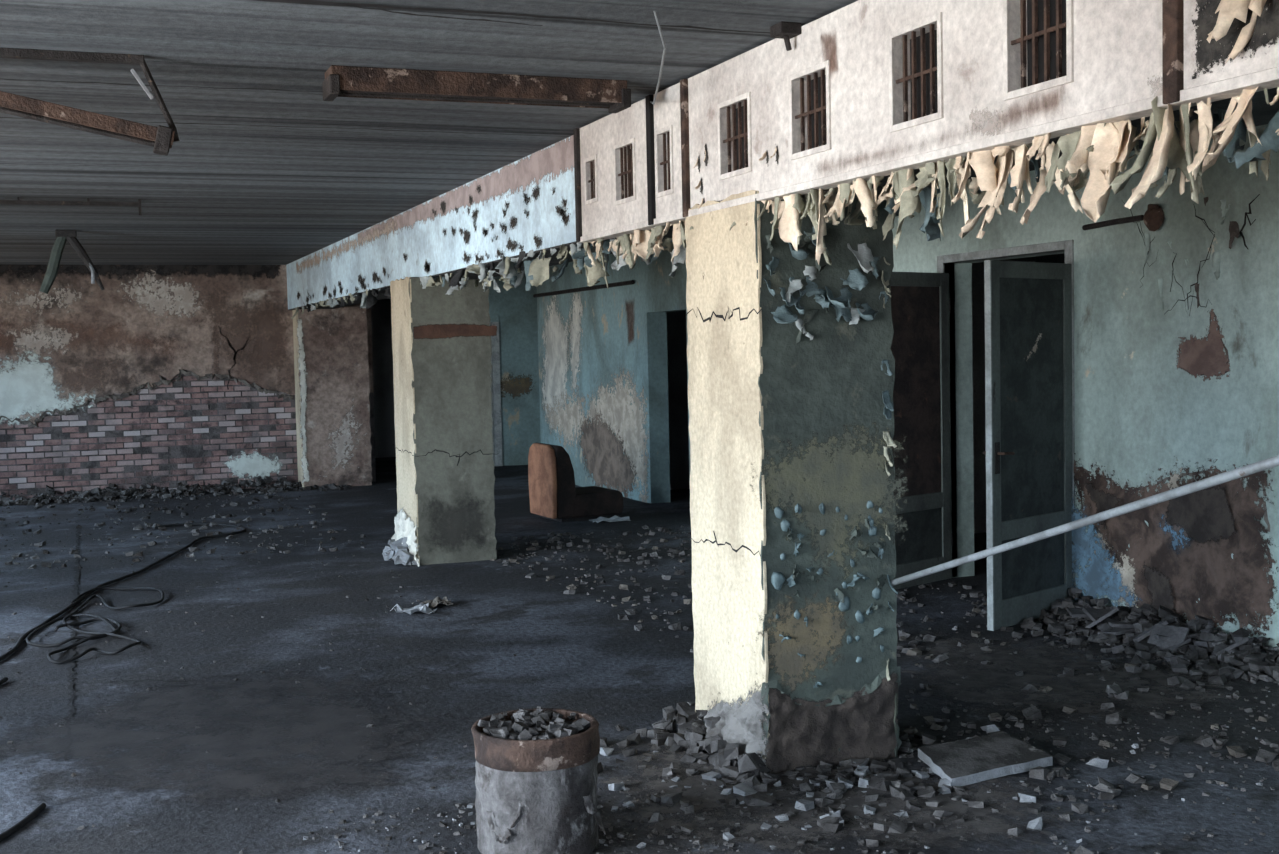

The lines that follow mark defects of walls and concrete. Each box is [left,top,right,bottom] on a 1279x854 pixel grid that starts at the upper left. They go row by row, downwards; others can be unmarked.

peeling [1192,0,1279,79]
peeling [693,144,708,209]
crack [685,305,761,323]
peeling [730,87,1279,343]
crack [1123,194,1260,316]
spalling [1176,259,1230,381]
spalling [698,360,909,774]
spalling [1072,453,1279,637]